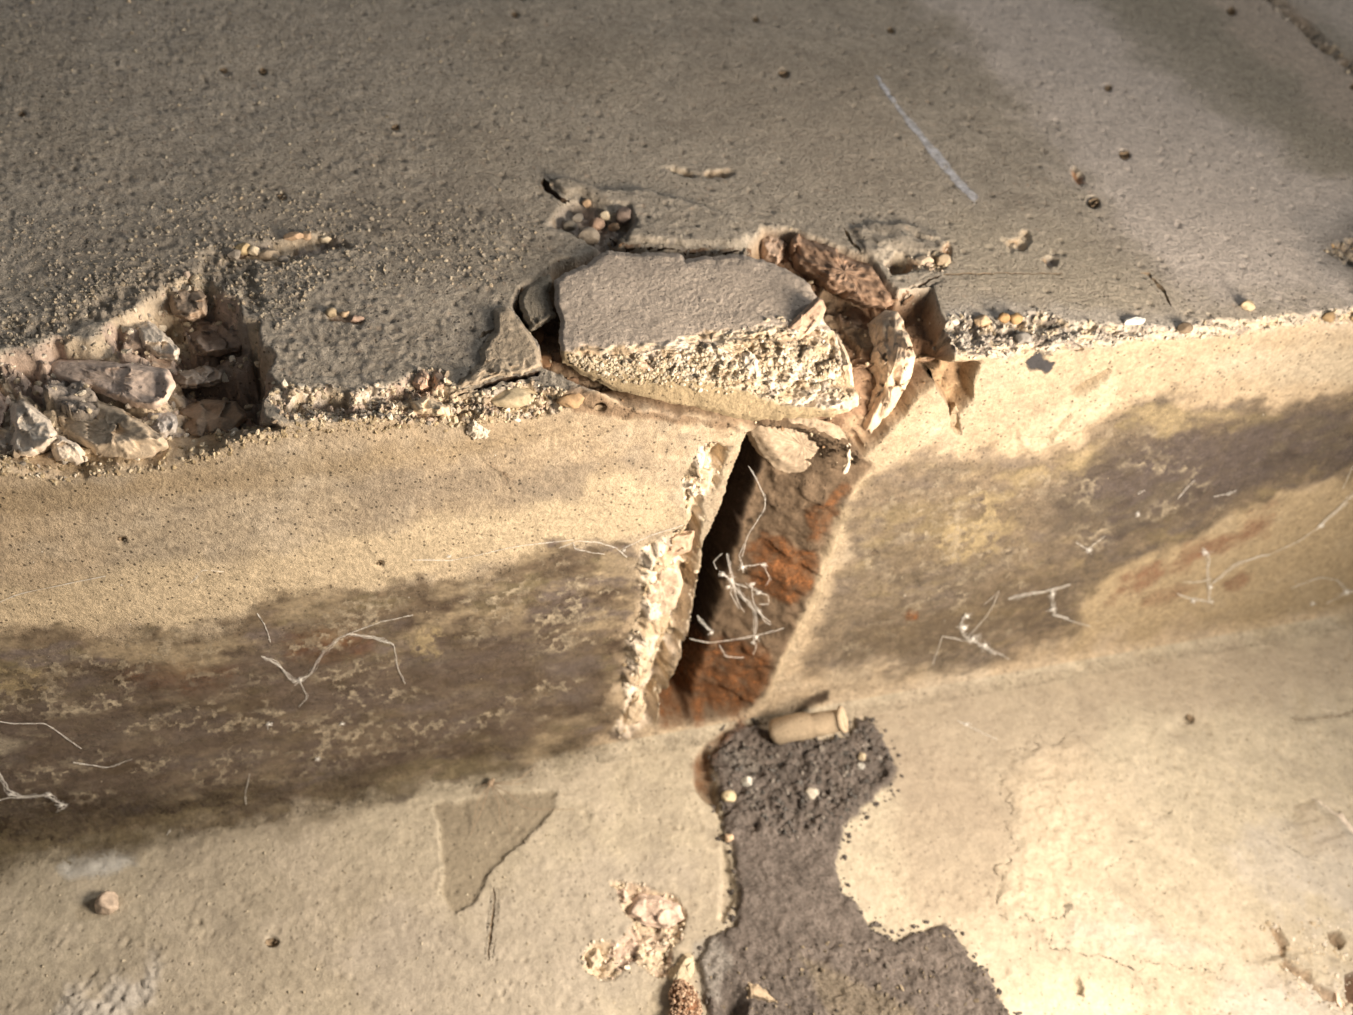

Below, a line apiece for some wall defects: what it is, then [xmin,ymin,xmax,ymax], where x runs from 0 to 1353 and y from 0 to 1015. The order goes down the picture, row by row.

spalling [1070,165,1099,208]
spalling [0,196,1353,486]
water stain [0,540,638,868]
spalling [609,442,734,740]
corrosion [656,419,875,727]
water stain [807,392,1353,669]